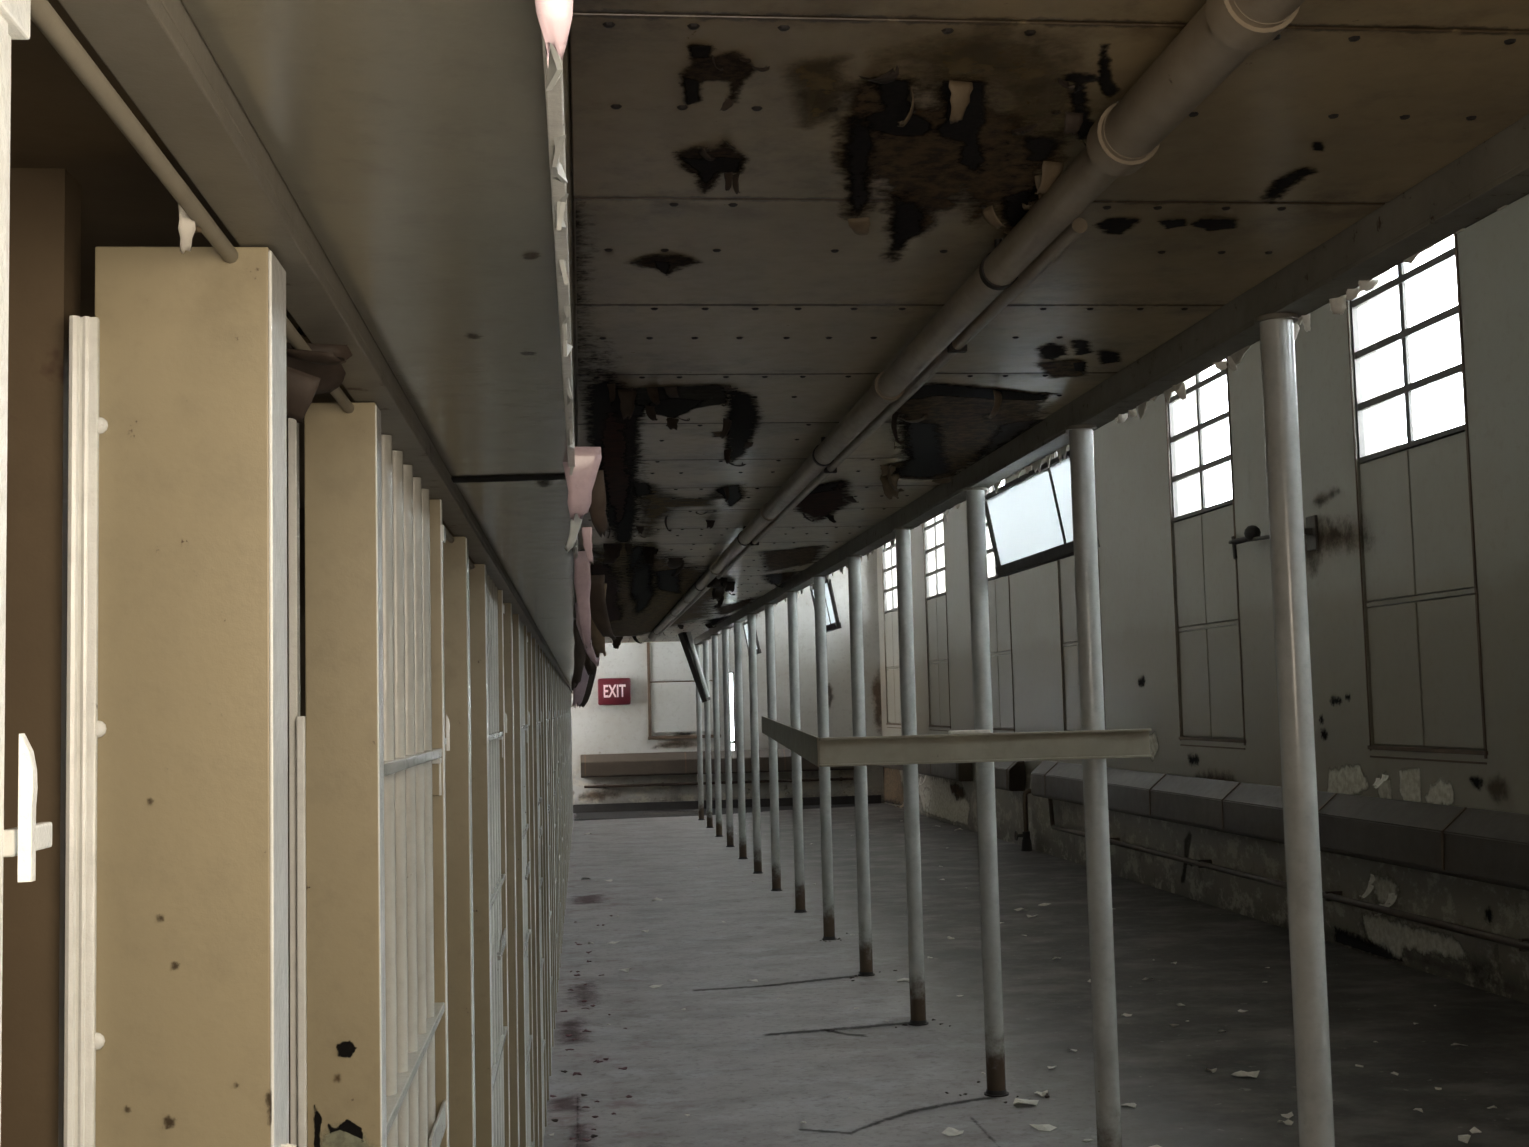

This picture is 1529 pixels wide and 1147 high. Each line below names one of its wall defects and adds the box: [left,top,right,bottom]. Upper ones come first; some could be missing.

peeling [679,44,770,111]
peeling [835,44,1120,260]
peeling [1329,279,1379,315]
peeling [1294,313,1311,341]
peeling [1173,383,1187,401]
peeling [611,384,762,467]
peeling [880,383,1057,499]
peeling [1117,409,1137,423]
spalling [1327,764,1454,805]
spalling [1469,778,1506,800]
spalling [336,1041,357,1058]
spalling [314,1105,368,1147]